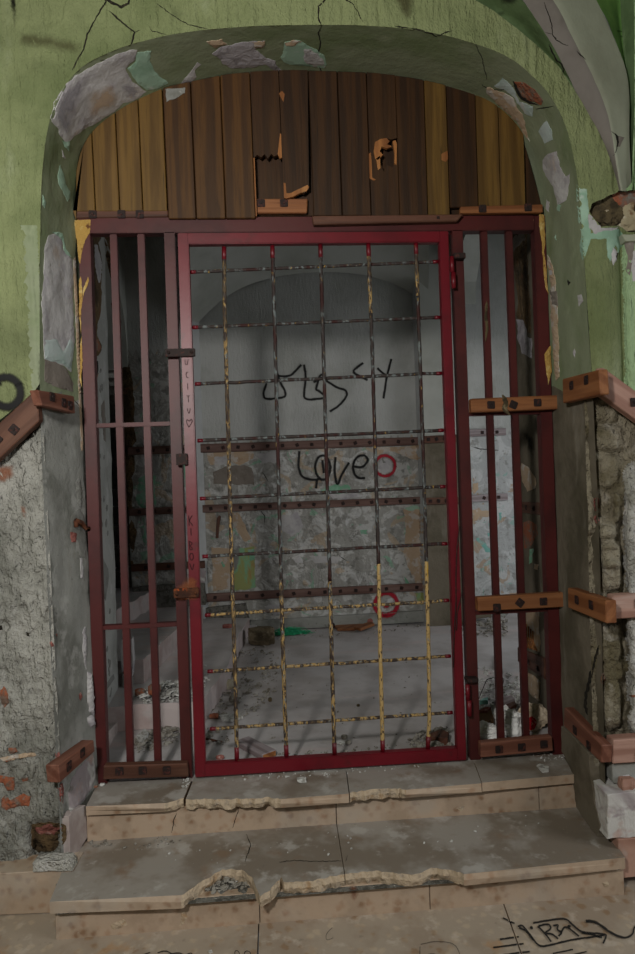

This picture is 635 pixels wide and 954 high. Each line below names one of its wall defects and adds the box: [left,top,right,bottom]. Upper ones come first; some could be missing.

crack [72,0,206,70]
peeling [206,39,327,72]
crack [318,0,362,71]
peeling [50,50,201,202]
flaking render [486,78,635,384]
peeling [41,219,112,451]
flaking render [0,686,9,708]
flaking render [0,747,36,762]
flaking render [0,775,31,810]